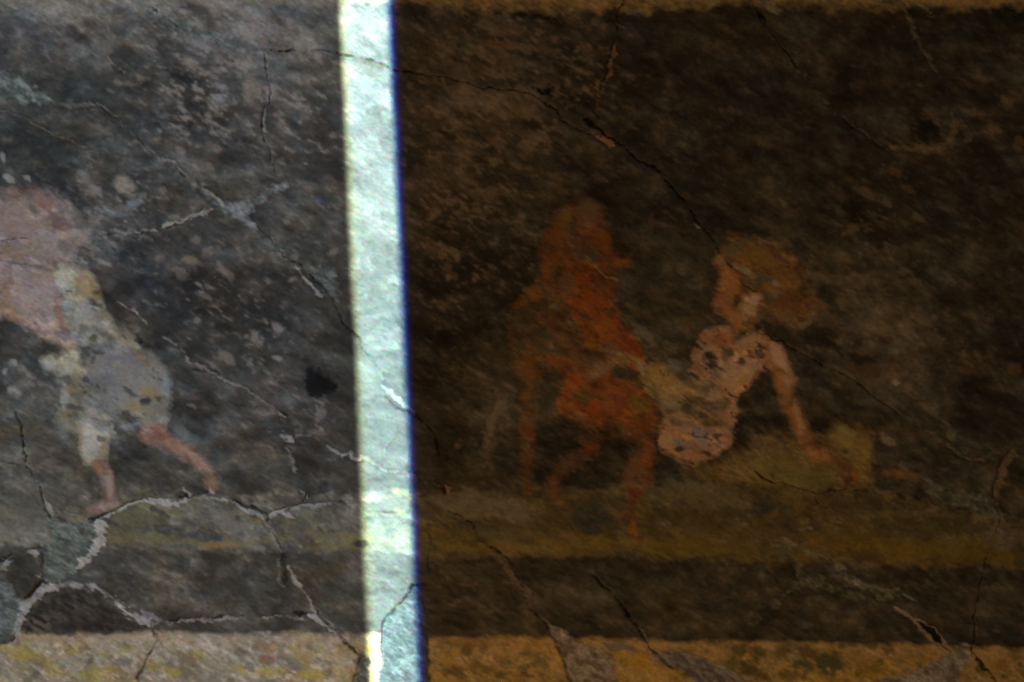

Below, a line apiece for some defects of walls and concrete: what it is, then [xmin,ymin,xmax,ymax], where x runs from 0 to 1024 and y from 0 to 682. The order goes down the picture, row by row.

crack [44,97,225,237]
crack [261,0,757,292]
crack [116,301,290,418]
crack [0,412,54,600]
spalling [13,516,174,647]
crack [88,486,432,682]
crack [257,226,573,682]
crack [754,330,1018,682]
spalling [892,593,956,652]